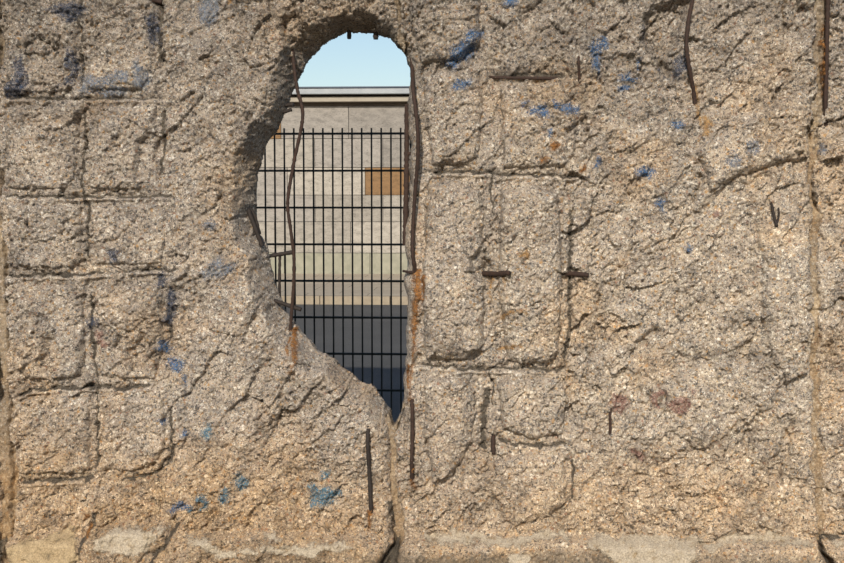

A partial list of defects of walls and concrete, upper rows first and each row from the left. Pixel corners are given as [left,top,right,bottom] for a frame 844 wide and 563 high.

spalling [276,9,303,52]
crack [0,0,179,484]
corrosion [406,269,426,402]
crack [0,537,8,558]
crack [817,532,844,563]